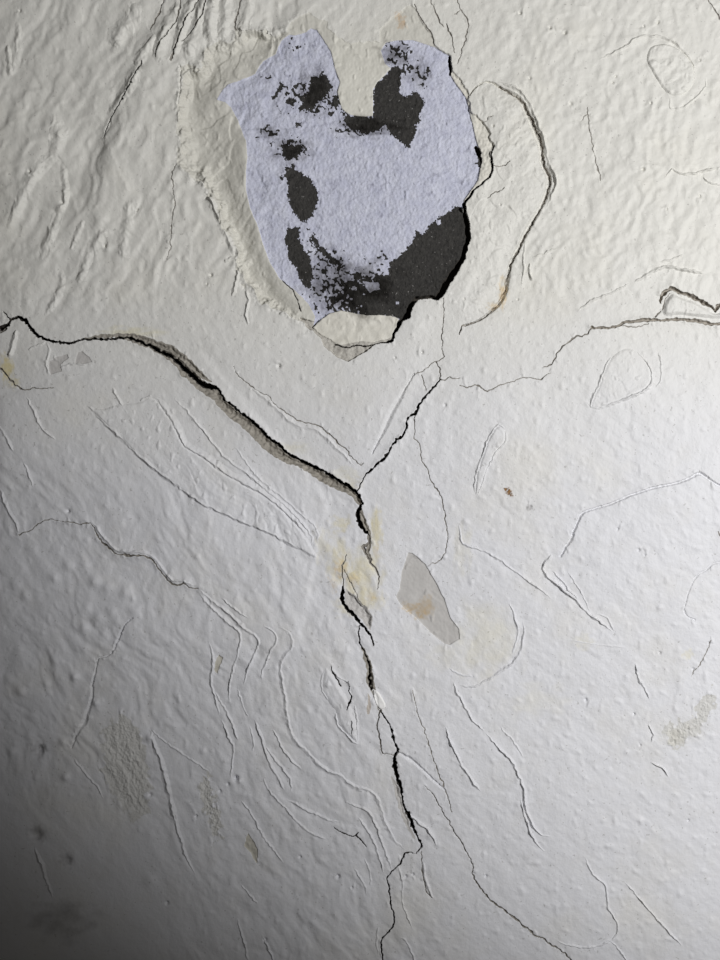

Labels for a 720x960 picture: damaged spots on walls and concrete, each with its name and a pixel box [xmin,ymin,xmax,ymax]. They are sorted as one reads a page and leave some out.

peeling [176,5,494,362]
crack [0,298,720,960]
peeling [396,553,460,645]